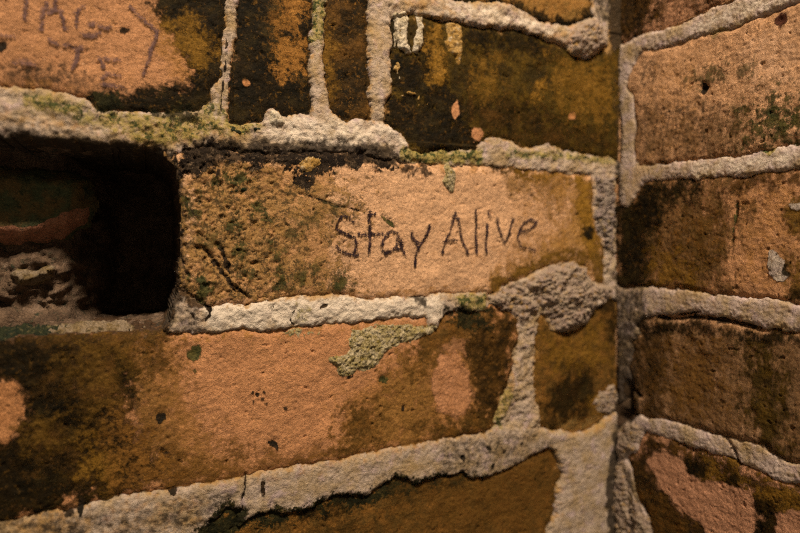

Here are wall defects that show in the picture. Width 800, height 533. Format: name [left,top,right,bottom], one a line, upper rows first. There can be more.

damp [384,0,664,161]
spalling [0,147,206,347]
damp [614,169,800,296]
peeling [767,250,790,281]
damp [326,303,518,461]